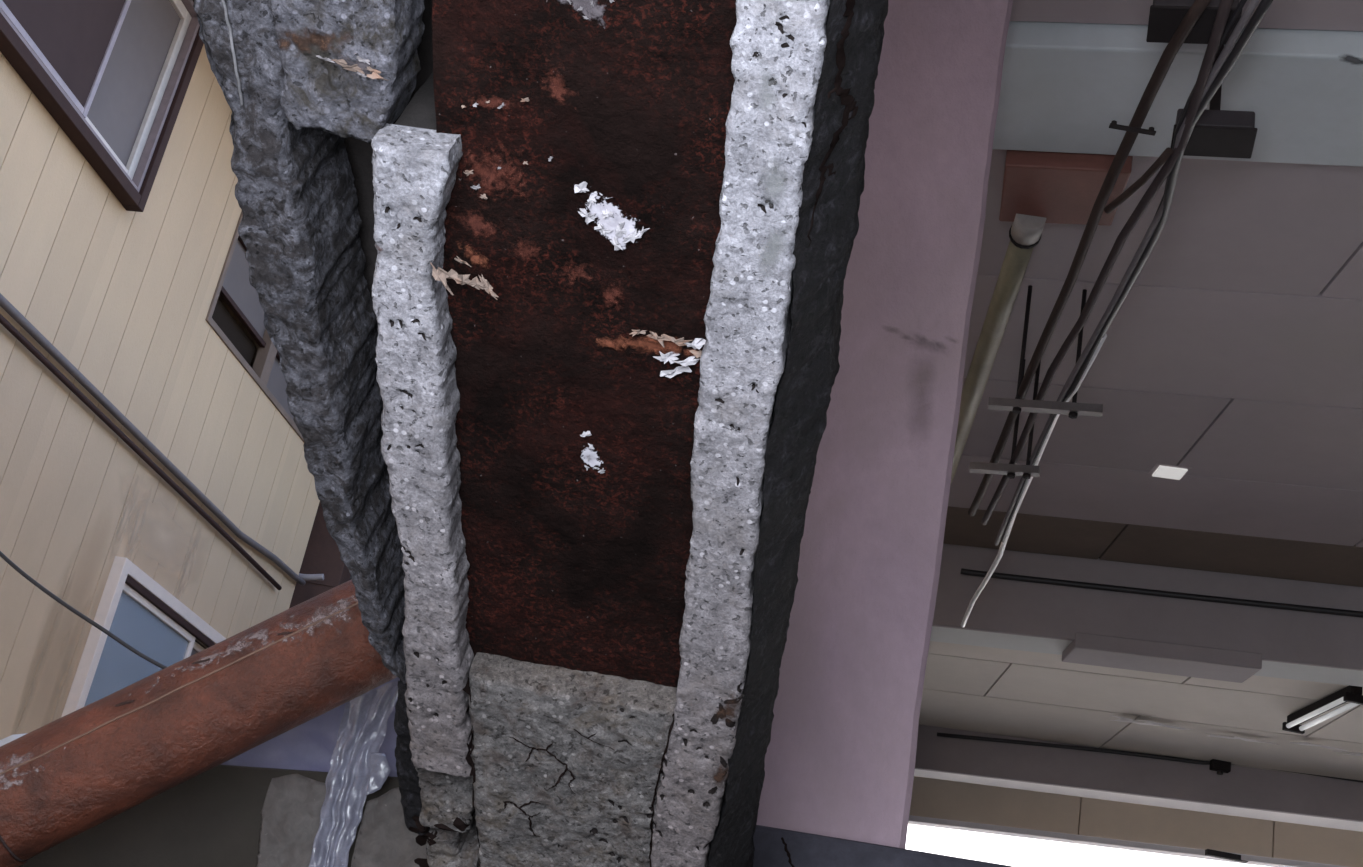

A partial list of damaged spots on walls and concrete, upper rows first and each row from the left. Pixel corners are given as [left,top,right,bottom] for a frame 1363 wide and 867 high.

peeling [560,0,615,25]
spalling [775,15,794,48]
rust [461,98,530,109]
rust [549,73,566,100]
rust [464,152,528,199]
peeling [574,182,650,250]
peeling [430,246,498,300]
rust [604,284,620,303]
rust [597,330,706,378]
peeling [580,431,606,474]
crack [463,677,614,842]